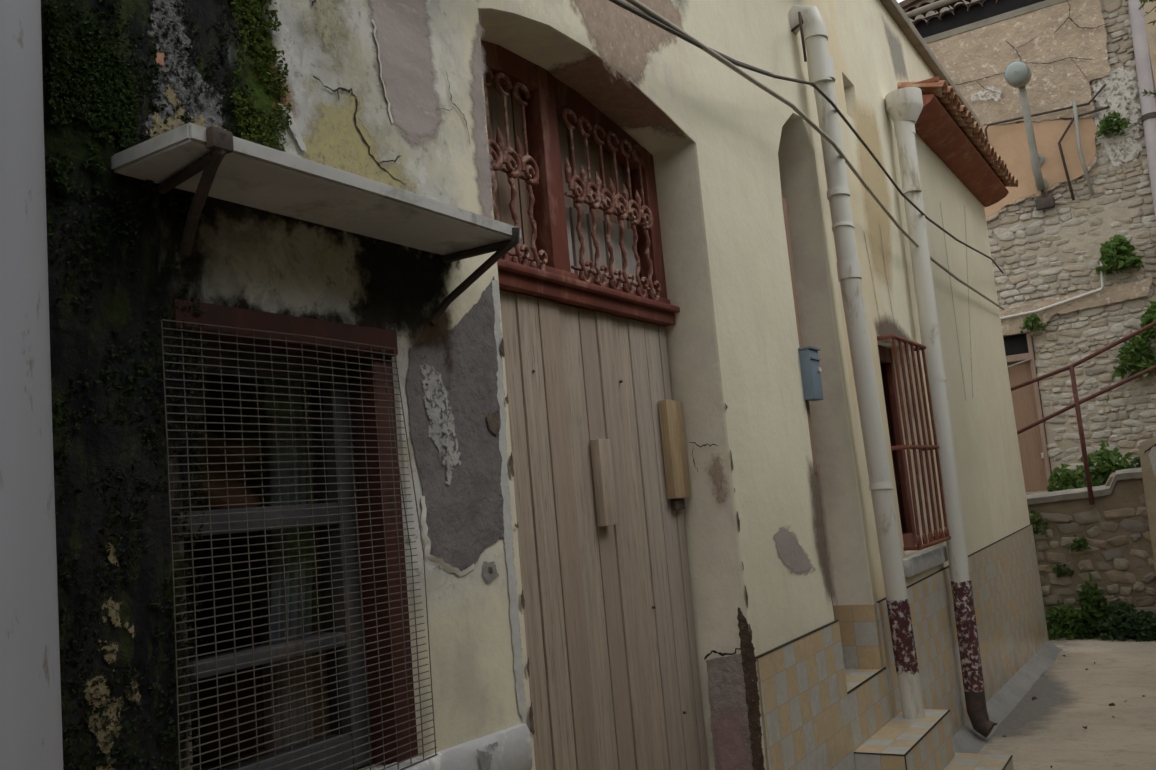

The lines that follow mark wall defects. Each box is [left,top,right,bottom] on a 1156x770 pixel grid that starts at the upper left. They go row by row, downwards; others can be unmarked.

crack [313,76,406,185]
flaking render [369,0,443,144]
flaking render [571,0,682,84]
mould [41,0,460,770]
spalling [406,277,535,735]
peeling [774,527,815,575]
spalling [704,586,765,770]